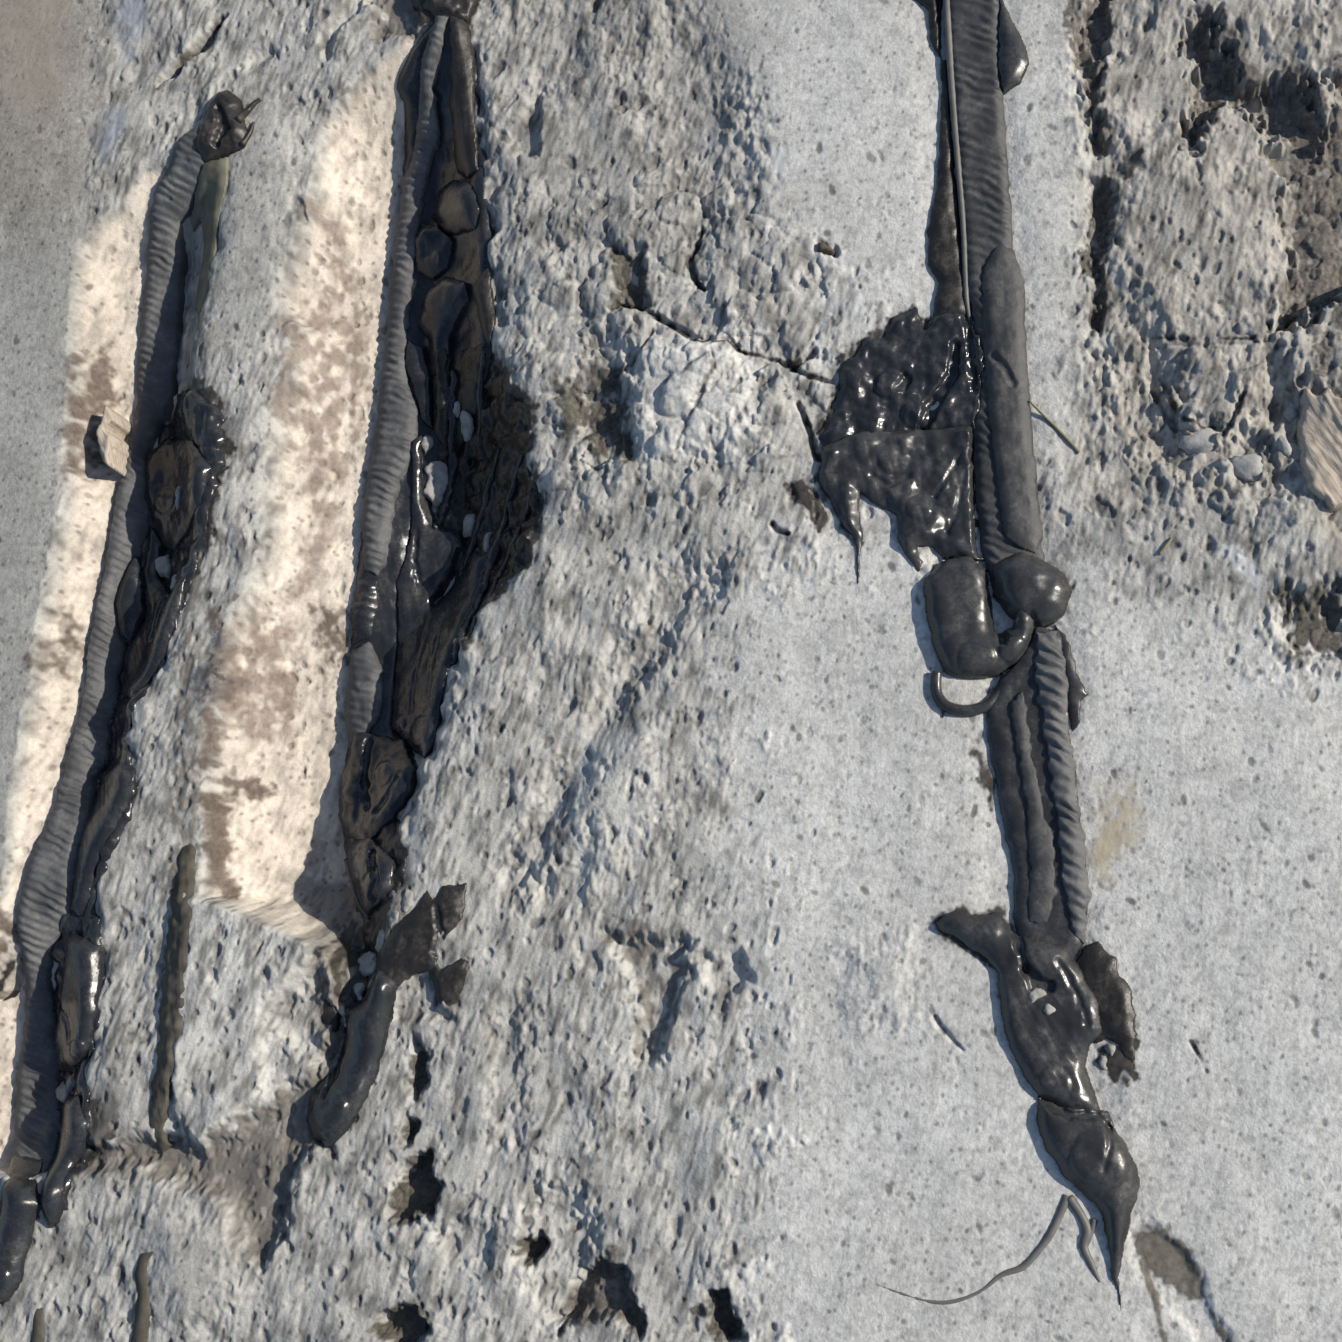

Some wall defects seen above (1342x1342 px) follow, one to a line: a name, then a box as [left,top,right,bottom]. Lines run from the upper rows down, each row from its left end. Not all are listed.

spalling [1063,0,1145,332]
spalling [1188,1,1342,377]
crack [686,230,706,292]
crack [617,301,823,428]
crack [762,414,821,462]
spalling [1270,577,1342,659]
crack [0,961,15,992]
spalling [389,1121,444,1224]
spalling [515,1236,549,1266]
spalling [371,1303,429,1342]
spalling [551,1245,646,1340]
spalling [690,1289,748,1342]